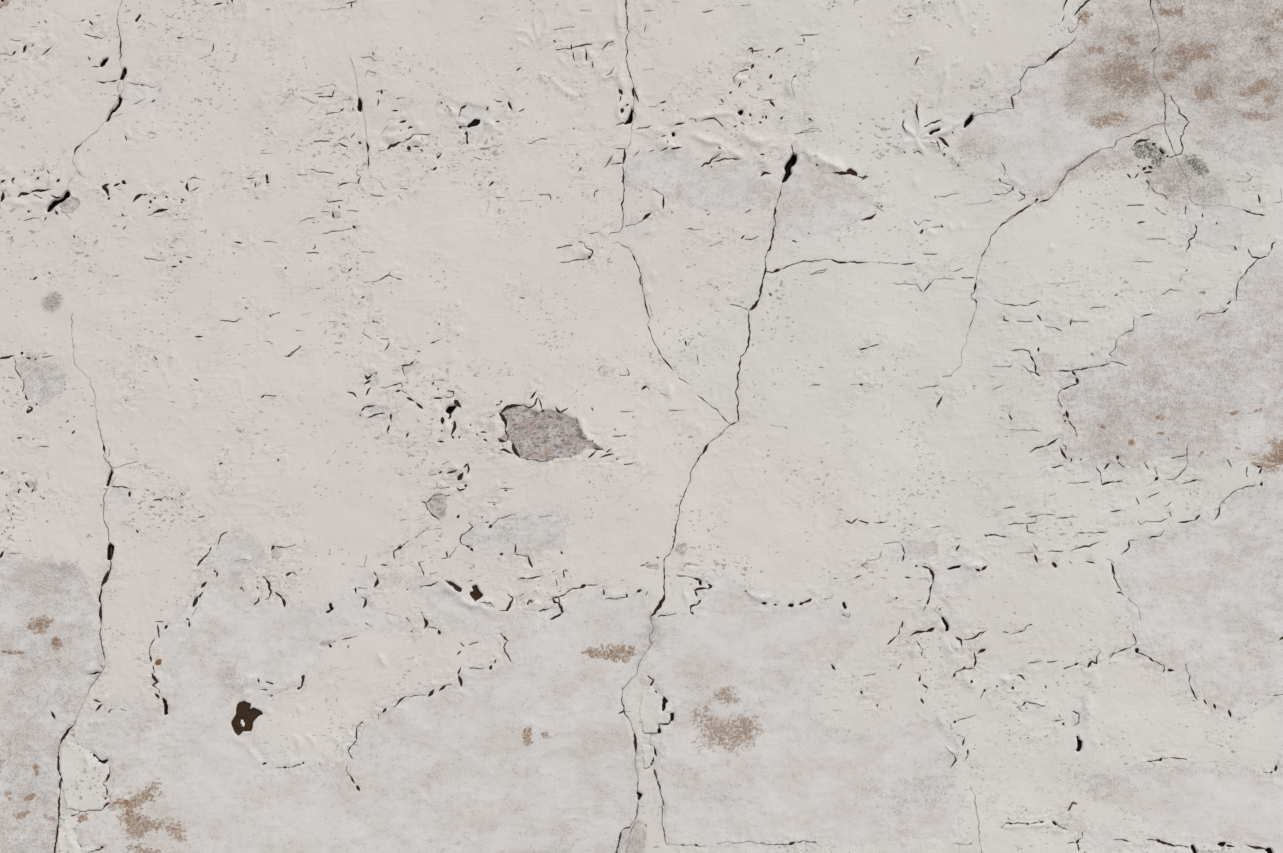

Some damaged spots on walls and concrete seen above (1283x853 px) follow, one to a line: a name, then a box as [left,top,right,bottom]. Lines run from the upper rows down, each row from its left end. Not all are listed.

crack [72,0,127,175]
crack [350,52,386,189]
water stain [1133,141,1165,167]
rust [1089,34,1215,98]
peeling [349,320,632,465]
crack [589,0,1265,853]
rust [1235,437,1283,472]
crack [51,314,137,853]
rust [582,644,637,663]
peeling [0,461,1283,853]
rust [694,687,758,751]
rust [106,782,187,853]